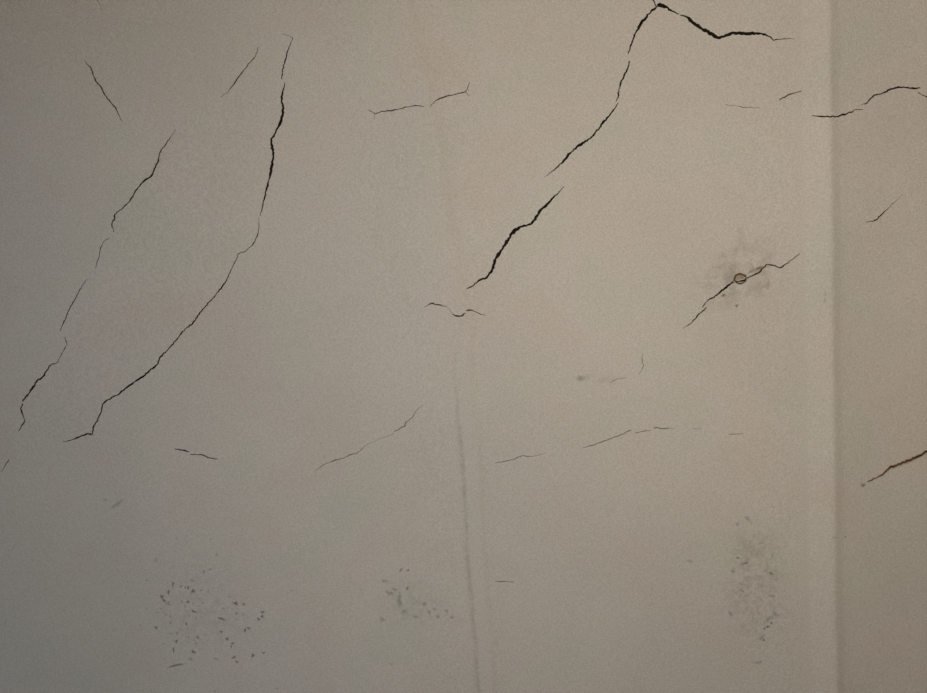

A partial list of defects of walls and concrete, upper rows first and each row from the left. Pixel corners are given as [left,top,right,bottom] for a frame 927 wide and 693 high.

crack [368,82,470,120]
crack [812,85,927,119]
crack [424,0,801,318]
crack [63,34,293,442]
crack [18,129,176,432]
crack [682,253,800,329]
crack [175,448,218,460]
crack [315,406,423,471]
crack [867,450,927,482]